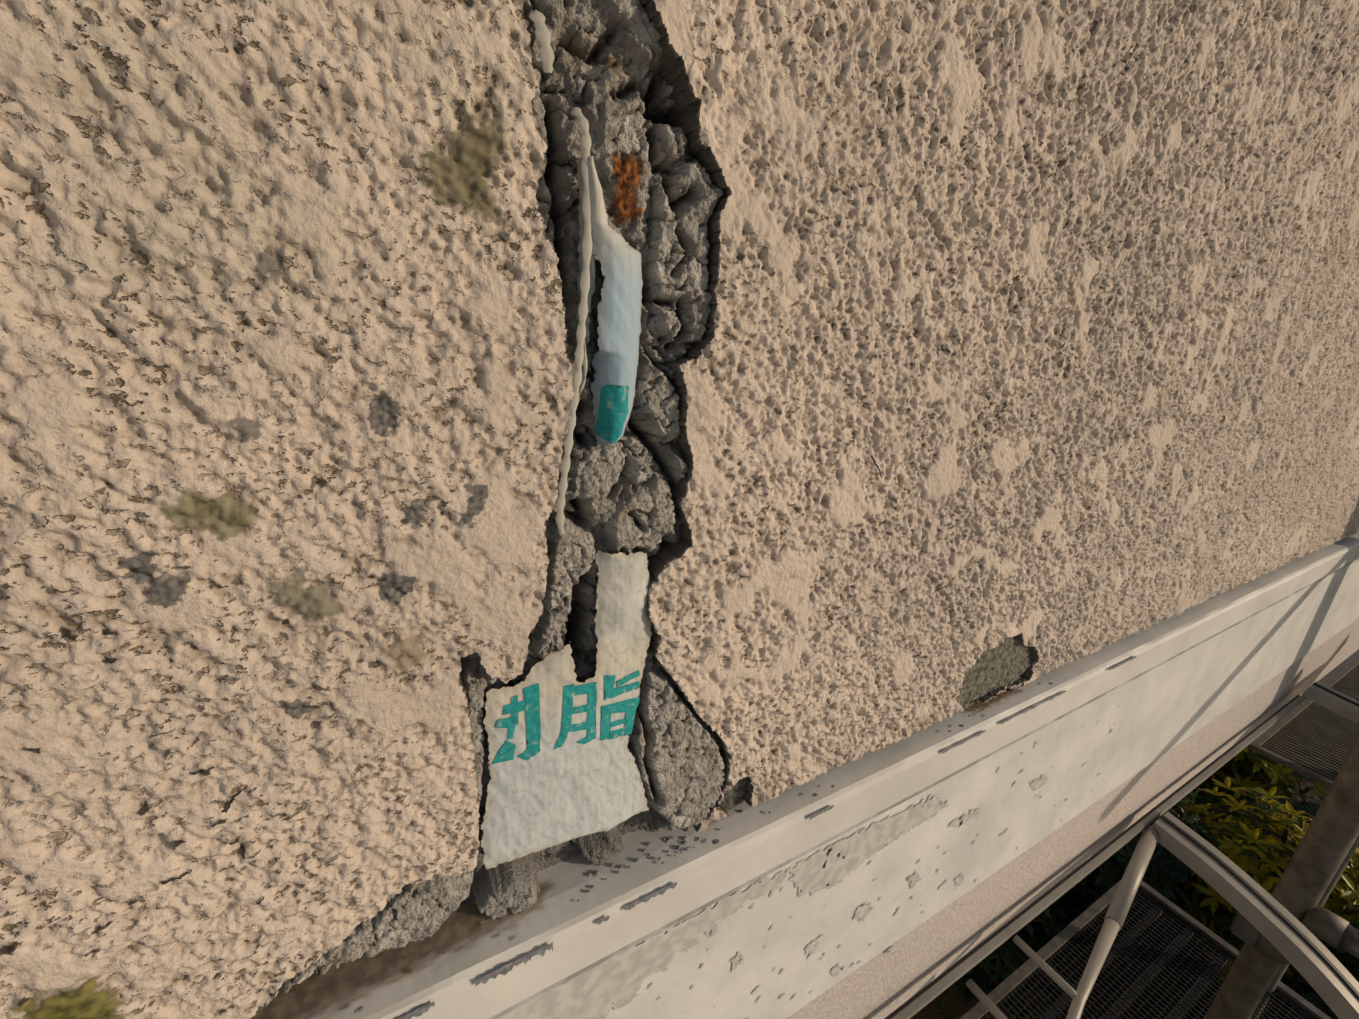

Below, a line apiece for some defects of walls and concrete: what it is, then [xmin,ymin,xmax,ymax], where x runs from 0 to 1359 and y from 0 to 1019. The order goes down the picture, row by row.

corrosion [607,150,645,226]
flaking render [230,418,262,441]
spalling [258,0,754,1010]
spalling [947,633,1040,732]
peeling [498,794,982,1019]